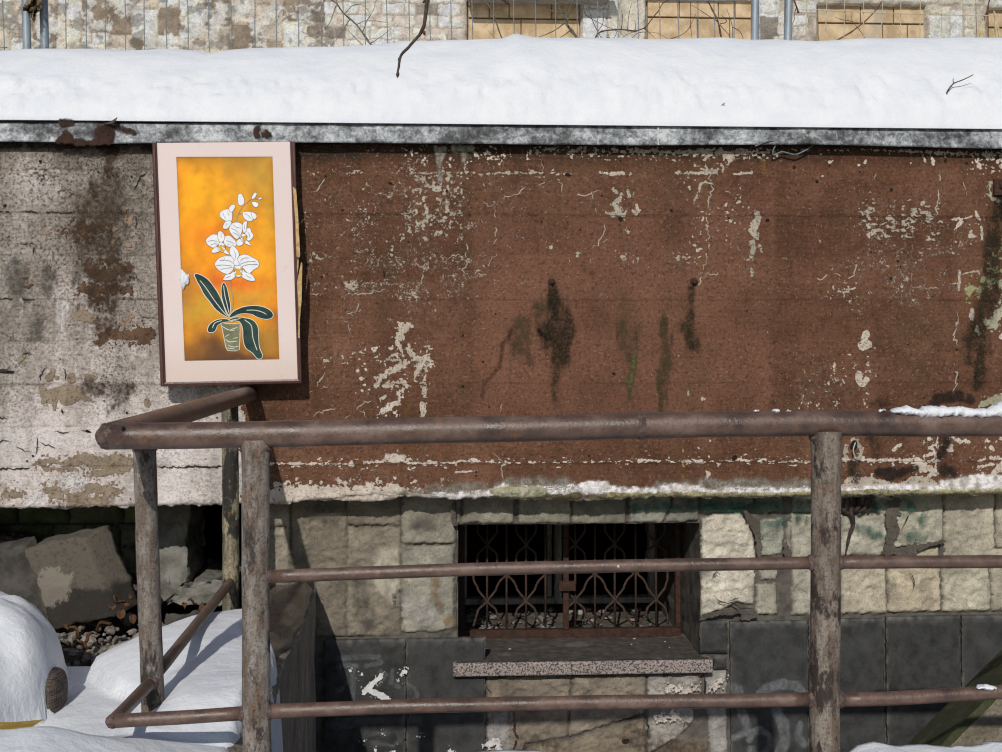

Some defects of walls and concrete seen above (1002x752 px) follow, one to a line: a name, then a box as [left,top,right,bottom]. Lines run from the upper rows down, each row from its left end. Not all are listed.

rust [55,118,136,146]
spalling [39,367,98,413]
leakage [0,141,152,332]
peeling [321,316,436,418]
leakage [513,285,575,400]
leakage [656,286,700,412]
peeling [383,145,1002,307]
leakage [963,196,1002,390]
peeling [269,439,811,504]